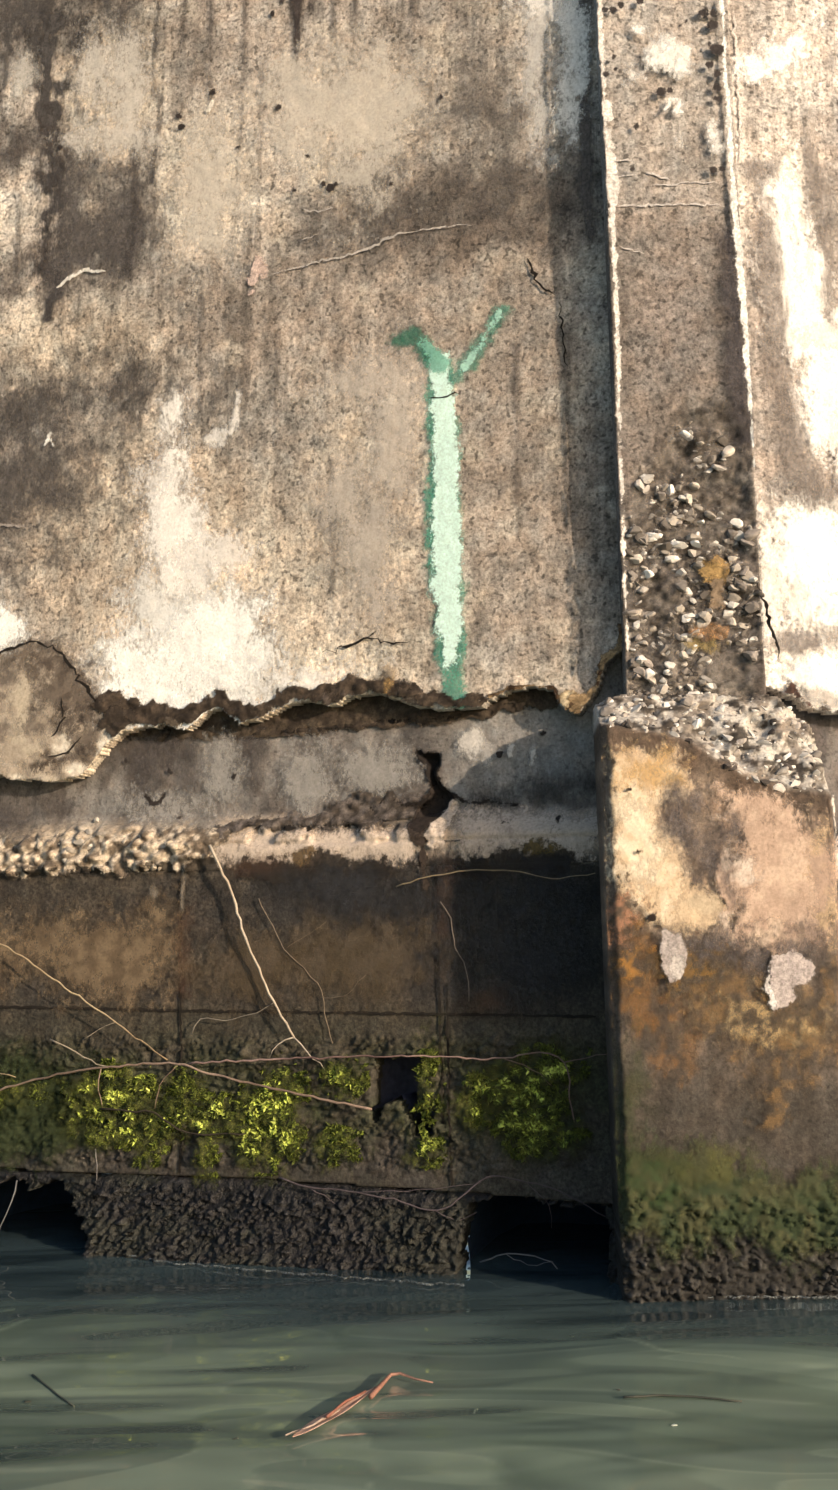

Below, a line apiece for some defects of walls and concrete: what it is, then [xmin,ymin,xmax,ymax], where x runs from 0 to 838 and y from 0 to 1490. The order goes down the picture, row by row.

leakage [0,338,352,825]
spalling [0,788,419,879]
crack [247,750,519,891]
leakage [0,0,838,712]
peeling [89,421,838,1010]
rust [607,872,829,1077]